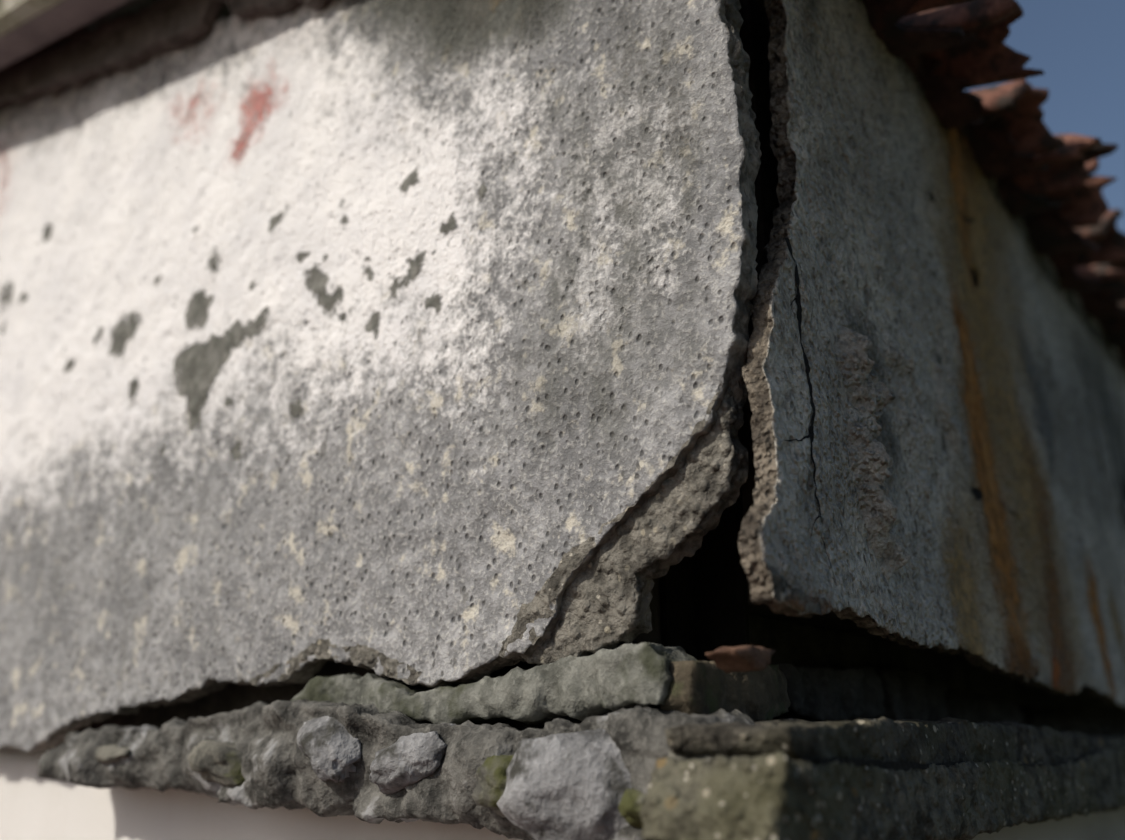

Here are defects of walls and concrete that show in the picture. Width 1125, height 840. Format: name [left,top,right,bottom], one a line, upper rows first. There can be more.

peeling [399,167,419,193]
peeling [440,212,456,234]
peeling [92,311,143,359]
peeling [170,246,269,430]
peeling [296,252,346,321]
peeling [365,312,380,339]
peeling [389,251,425,298]
peeling [424,294,441,313]
crack [782,238,836,583]
crack [660,486,750,661]
rust [1086,560,1125,700]
spalling [249,639,422,686]